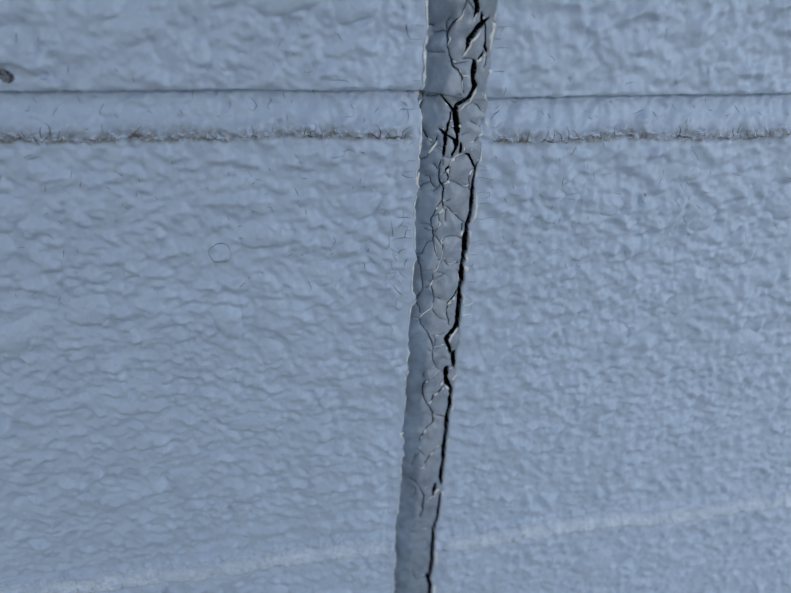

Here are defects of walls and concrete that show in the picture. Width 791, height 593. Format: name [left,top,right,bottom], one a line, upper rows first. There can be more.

crack [2,105,118,159]
crack [675,100,789,173]
crack [128,0,646,593]